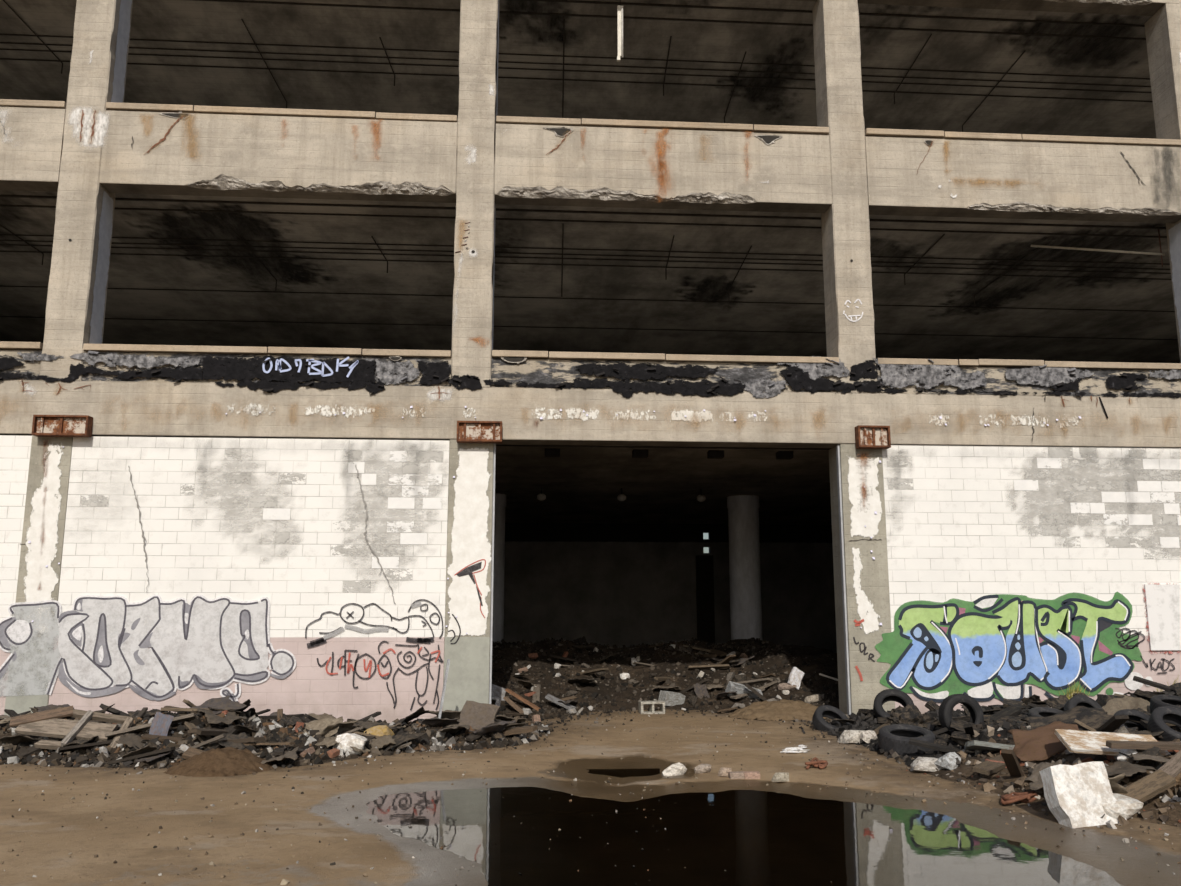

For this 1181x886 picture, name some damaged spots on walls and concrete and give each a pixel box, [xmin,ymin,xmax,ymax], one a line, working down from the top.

leakage [139,202,331,285]
spalling [500,186,754,204]
peeling [0,191,1181,424]
peeling [929,414,949,427]
peeling [979,414,1081,428]
crack [128,466,149,593]
crack [355,465,396,604]
peeling [331,447,492,637]
peeling [848,452,913,635]